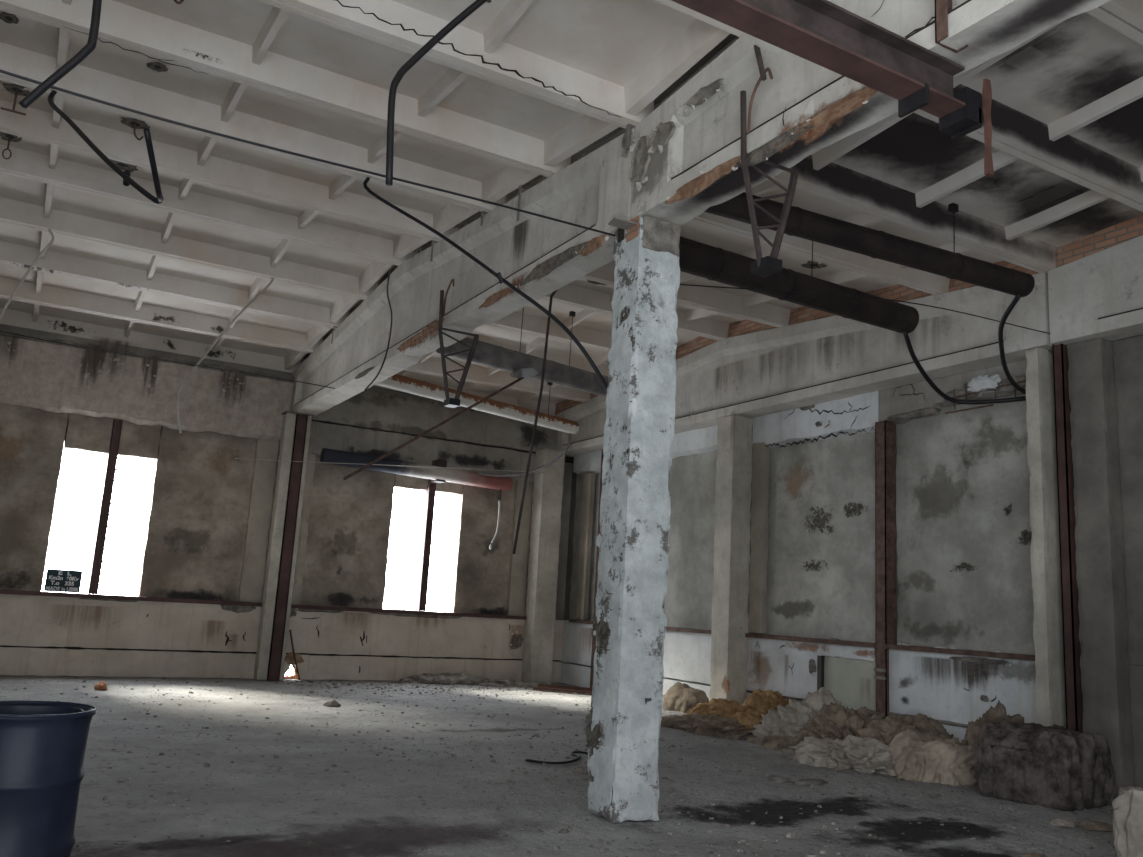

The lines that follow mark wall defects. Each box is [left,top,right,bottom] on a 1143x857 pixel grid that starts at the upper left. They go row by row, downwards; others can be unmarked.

flaking render [683,79,724,112]
flaking render [621,121,676,191]
spalling [665,87,878,204]
water stain [81,338,129,377]
crack [765,384,925,447]
spalling [887,373,1026,420]
spalling [805,503,866,535]
water stain [925,658,998,683]
flaking render [584,692,605,782]